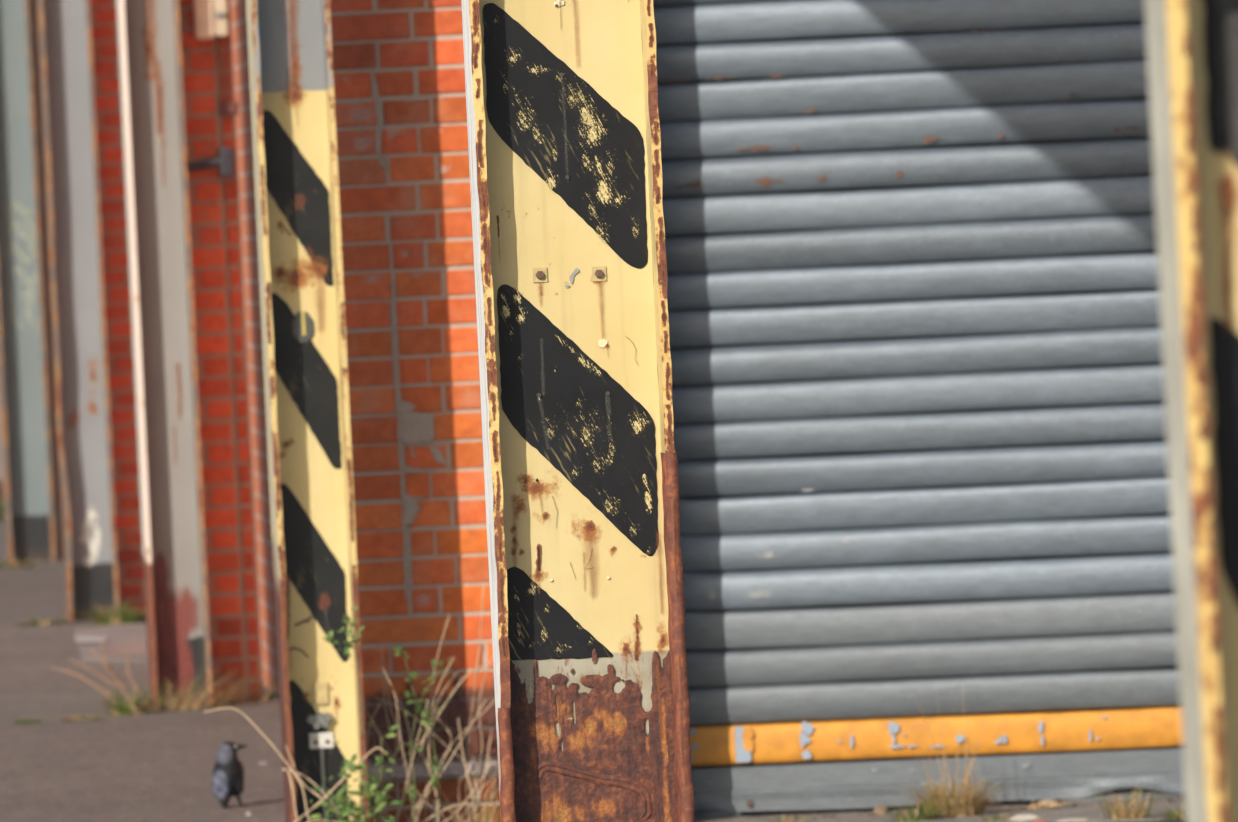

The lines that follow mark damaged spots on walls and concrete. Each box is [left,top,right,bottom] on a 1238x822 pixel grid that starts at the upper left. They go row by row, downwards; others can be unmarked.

rust [285,0,303,105]
rust [472,1,480,99]
peeling [503,48,629,243]
rust [477,119,500,326]
rust [265,260,327,344]
peeling [547,398,616,476]
peeling [632,413,650,437]
peeling [642,472,652,513]
rust [489,300,695,822]
peeling [735,725,754,763]
peeling [800,720,814,759]
rust [1212,707,1228,822]